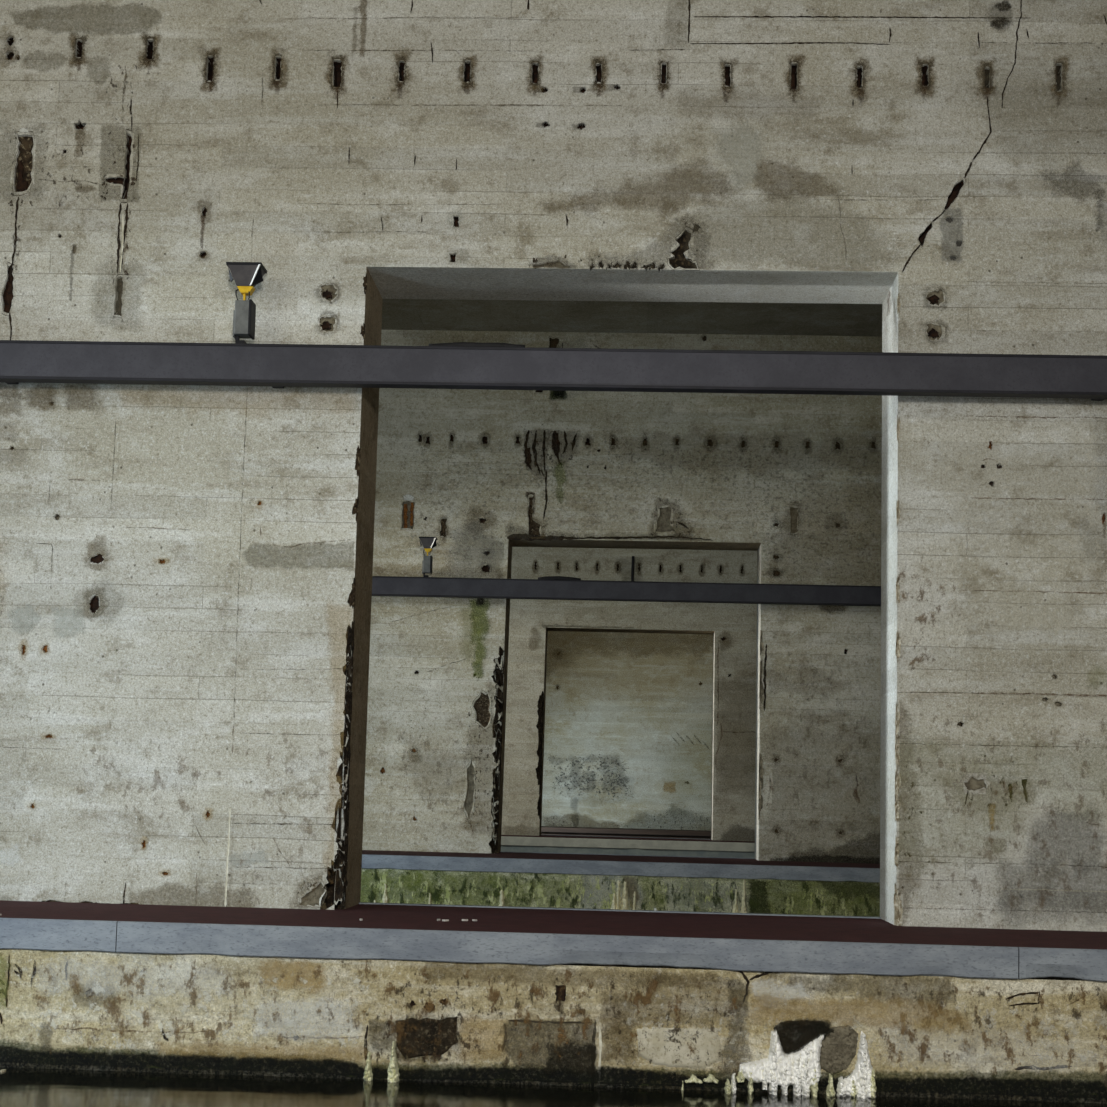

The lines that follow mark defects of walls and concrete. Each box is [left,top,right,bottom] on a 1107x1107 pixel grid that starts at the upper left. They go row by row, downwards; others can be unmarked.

crack [902,0,1107,272]
spalling [529,219,702,271]
damp [469,598,489,678]
spalling [298,578,356,910]
spalling [463,646,505,853]
damp [19,963,376,1055]
damp [363,1051,373,1081]
spalling [360,999,460,1063]
damp [384,966,658,1083]
spalling [502,1018,596,1075]
damp [654,979,1075,1099]
damp [1069,987,1107,1020]